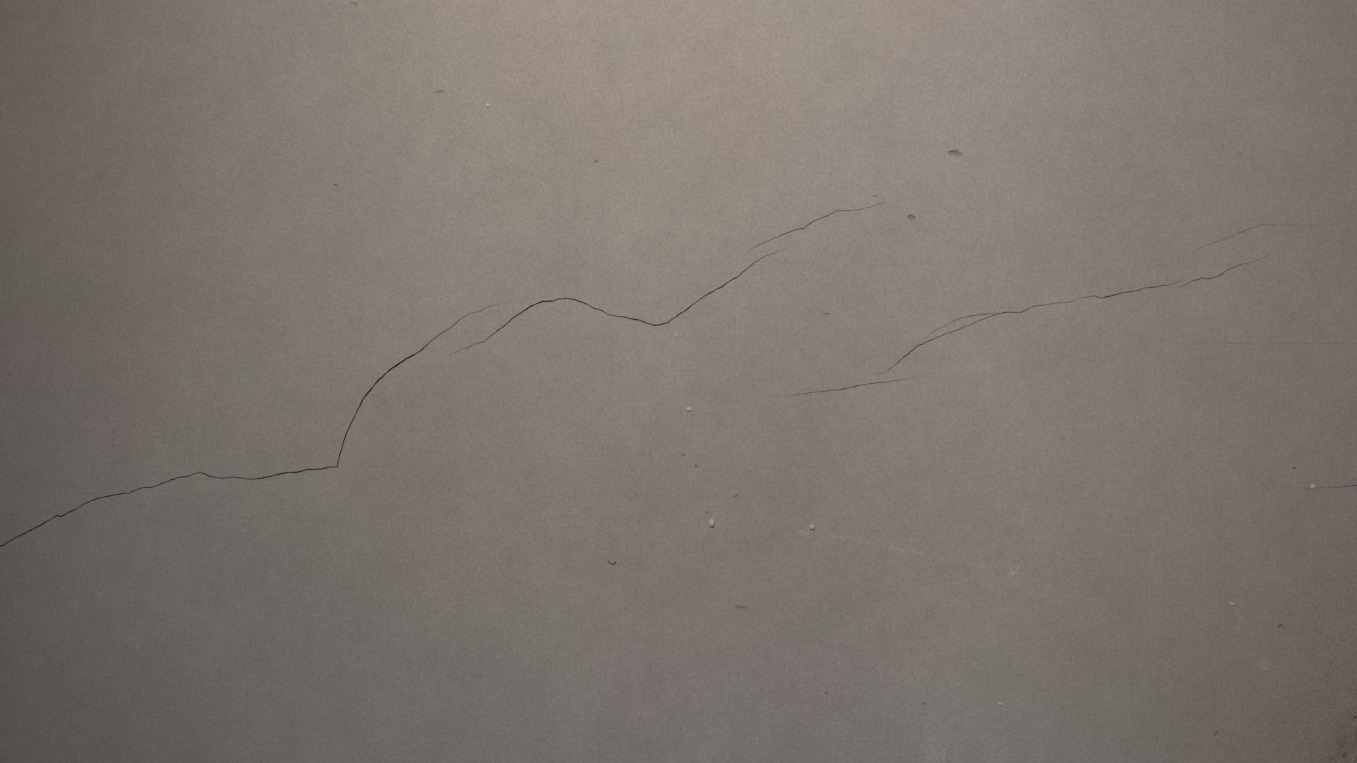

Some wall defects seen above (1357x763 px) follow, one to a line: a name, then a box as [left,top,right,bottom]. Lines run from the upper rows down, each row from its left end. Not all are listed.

crack [0,201,888,547]
crack [789,224,1283,396]